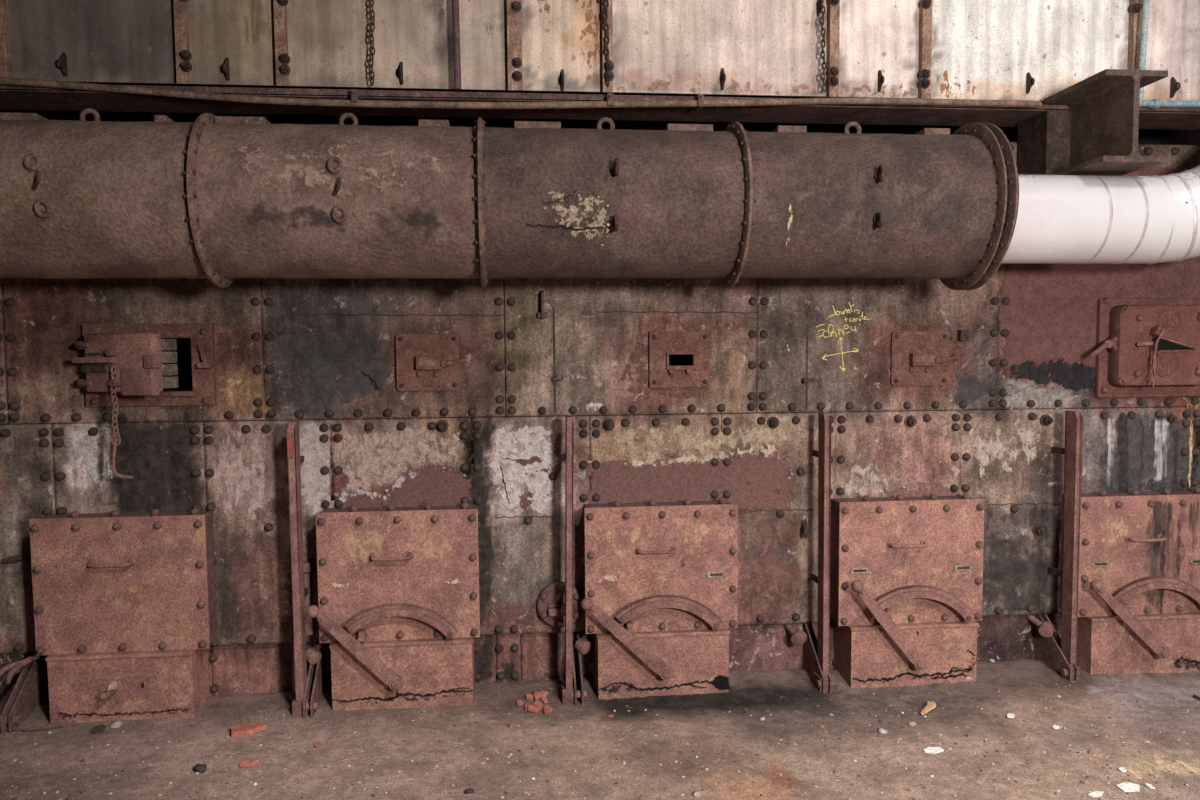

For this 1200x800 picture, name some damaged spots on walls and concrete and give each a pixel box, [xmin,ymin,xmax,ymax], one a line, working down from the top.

corrosion [576,0,602,80]
peeling [1125,164,1185,176]
peeling [968,257,1200,480]
peeling [299,420,475,518]
peeling [488,425,564,514]
peeling [586,423,799,513]
water stain [1099,413,1200,613]